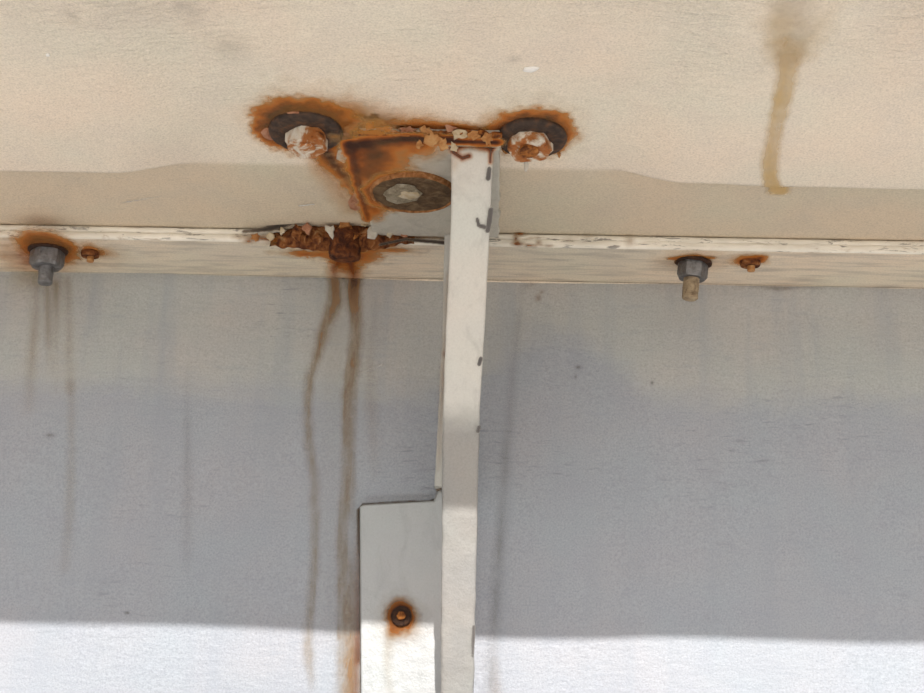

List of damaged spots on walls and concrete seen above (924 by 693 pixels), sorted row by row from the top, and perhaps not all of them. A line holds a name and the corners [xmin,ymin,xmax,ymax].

water stain [763,54,796,195]
rust [15,230,105,265]
rust [242,96,578,417]
rust [734,255,768,265]
rust [343,602,361,693]
rust [386,599,416,635]